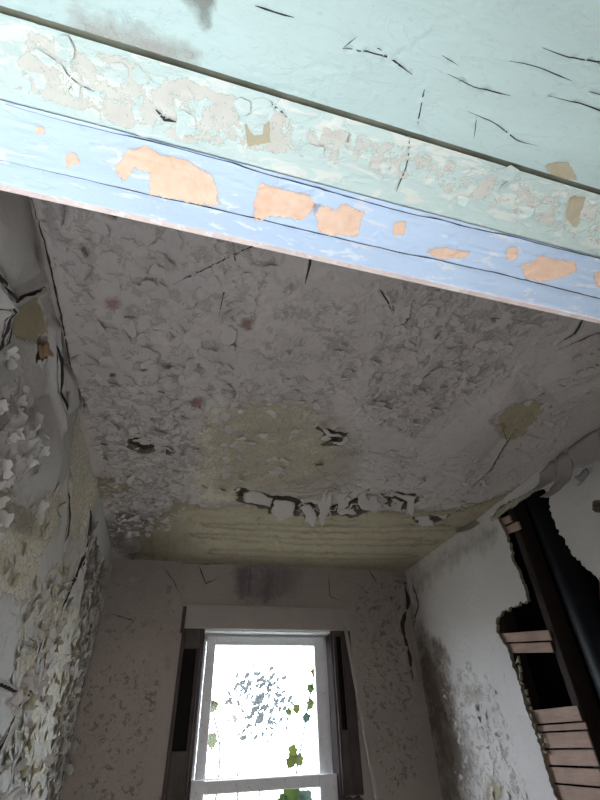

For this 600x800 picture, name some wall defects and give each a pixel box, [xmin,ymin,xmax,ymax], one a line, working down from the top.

crack [0,198,88,414]
flaking render [40,200,339,547]
crack [1,160,600,299]
crack [6,89,600,259]
peeling [16,30,600,245]
peeling [358,282,569,444]
crack [510,47,600,81]
flaking render [0,297,110,800]
leakage [107,491,512,572]
spalling [489,428,600,800]
leakage [412,616,463,800]
leakage [487,782,501,800]